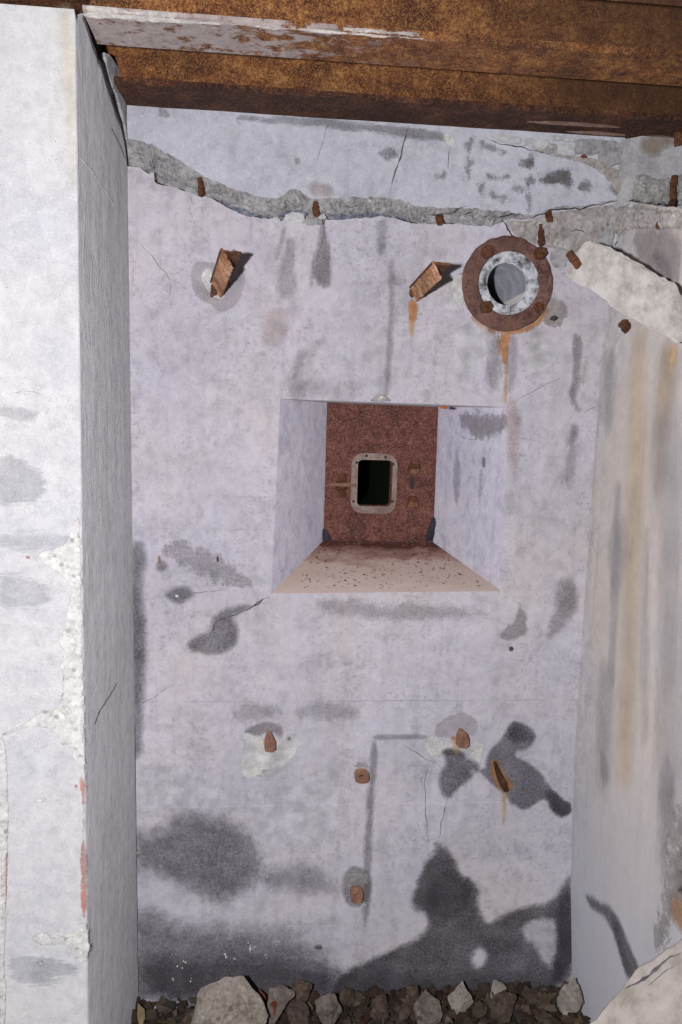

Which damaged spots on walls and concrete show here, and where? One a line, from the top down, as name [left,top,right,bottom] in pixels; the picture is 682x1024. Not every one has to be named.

spalling [197,177,205,196]
spalling [312,201,320,218]
crack [112,126,681,237]
leakage [315,227,329,285]
corrosion [409,301,417,334]
crack [209,597,268,637]
spalling [0,518,90,1024]
crack [407,747,447,836]
leakage [442,722,570,815]
leakage [142,820,252,894]
leakage [138,847,572,1001]
leakage [587,897,637,976]